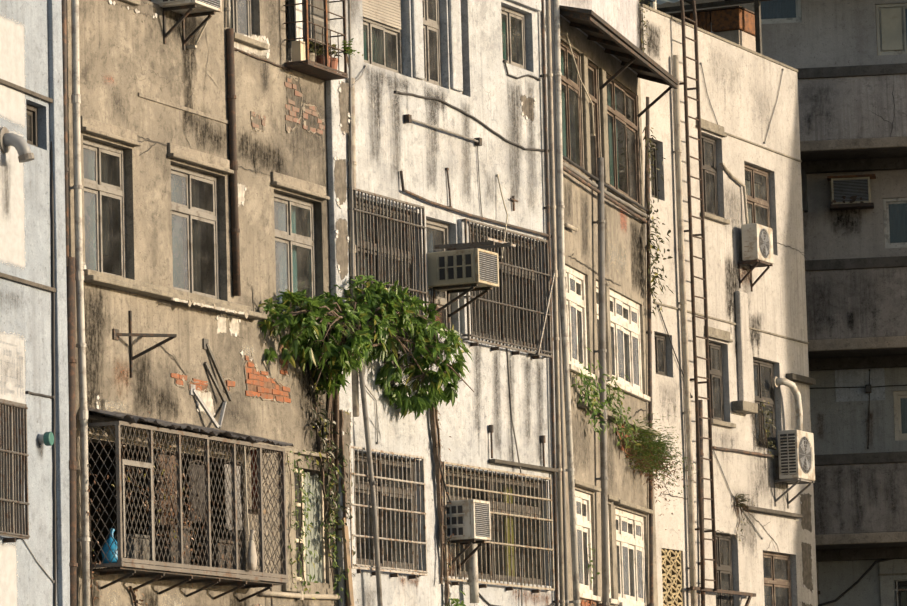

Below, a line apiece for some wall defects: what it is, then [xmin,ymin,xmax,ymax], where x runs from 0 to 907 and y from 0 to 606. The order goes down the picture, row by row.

damp [166,12,225,149]
damp [239,134,283,173]
flaking render [284,75,325,136]
damp [368,72,407,155]
damp [427,90,445,155]
damp [510,87,533,193]
damp [725,260,739,353]
peeling [170,372,215,416]
flaking render [223,336,292,403]